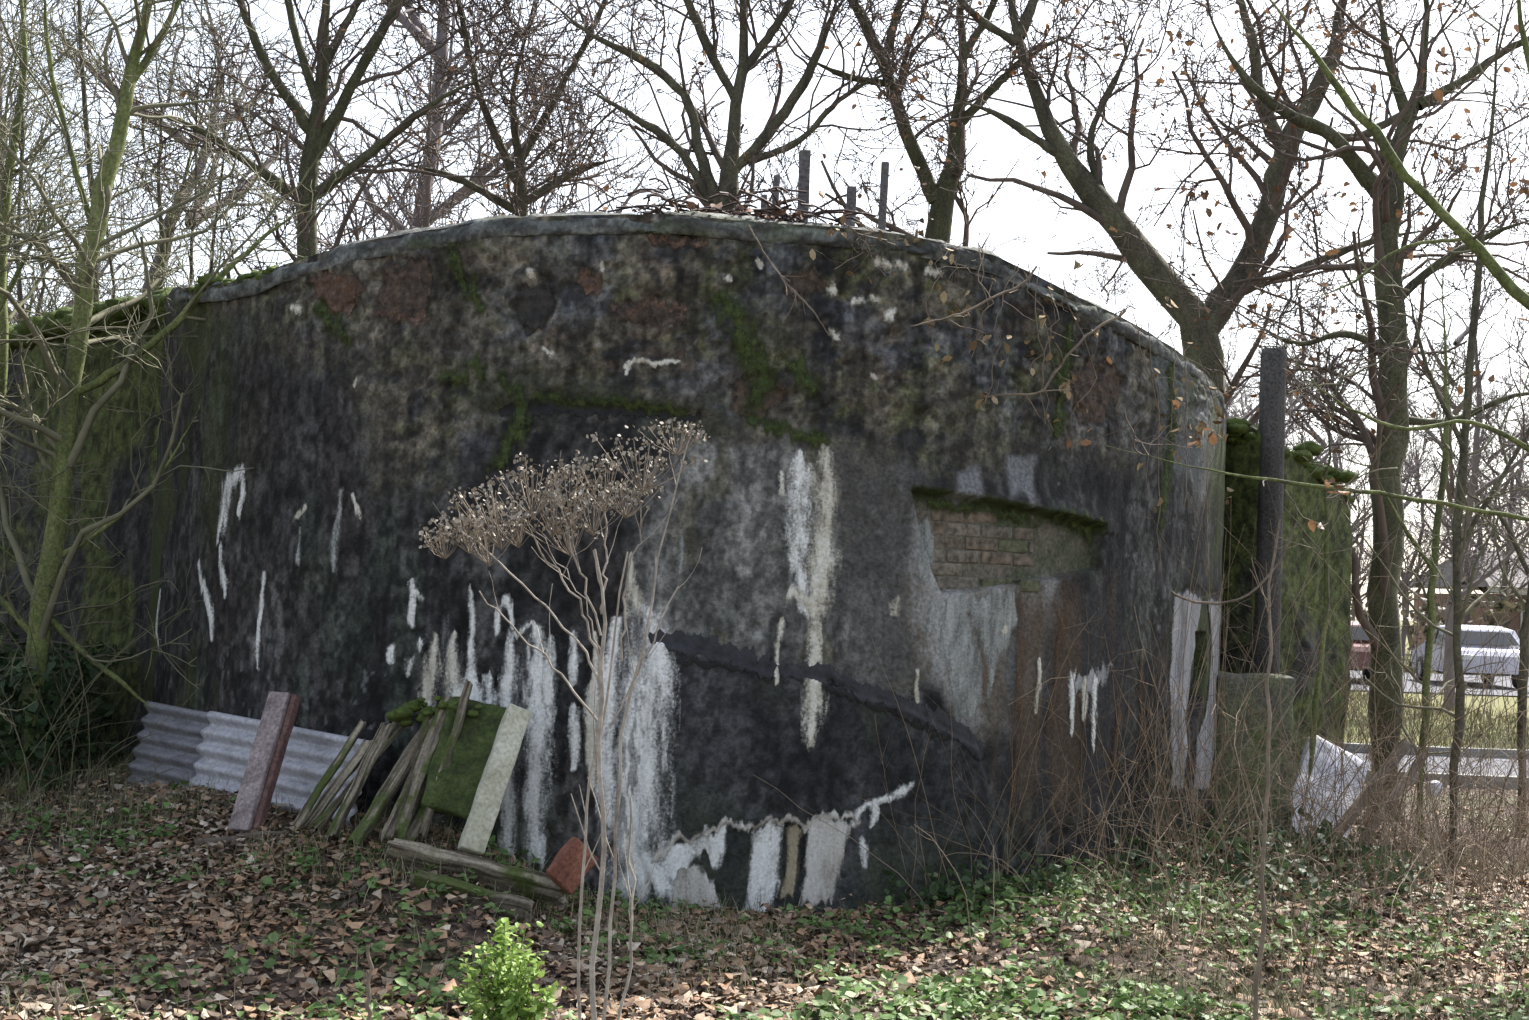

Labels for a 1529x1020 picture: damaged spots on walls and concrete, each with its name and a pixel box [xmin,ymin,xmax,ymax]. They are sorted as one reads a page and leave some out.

leakage [198,464,245,642]
leakage [295,504,307,565]
leakage [331,490,361,572]
leakage [774,443,838,746]
spalling [916,518,934,583]
leakage [386,552,675,902]
spalling [941,588,1018,719]
leakage [1034,657,1042,714]
leakage [1069,663,1112,752]